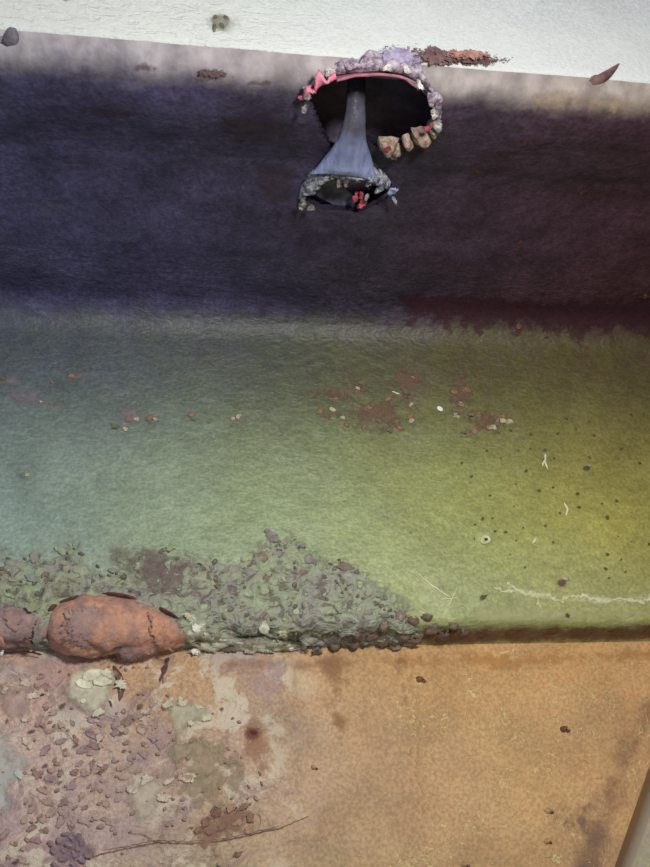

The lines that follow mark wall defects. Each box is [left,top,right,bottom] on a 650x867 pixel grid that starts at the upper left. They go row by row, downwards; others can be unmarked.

crack [85,812,310,860]